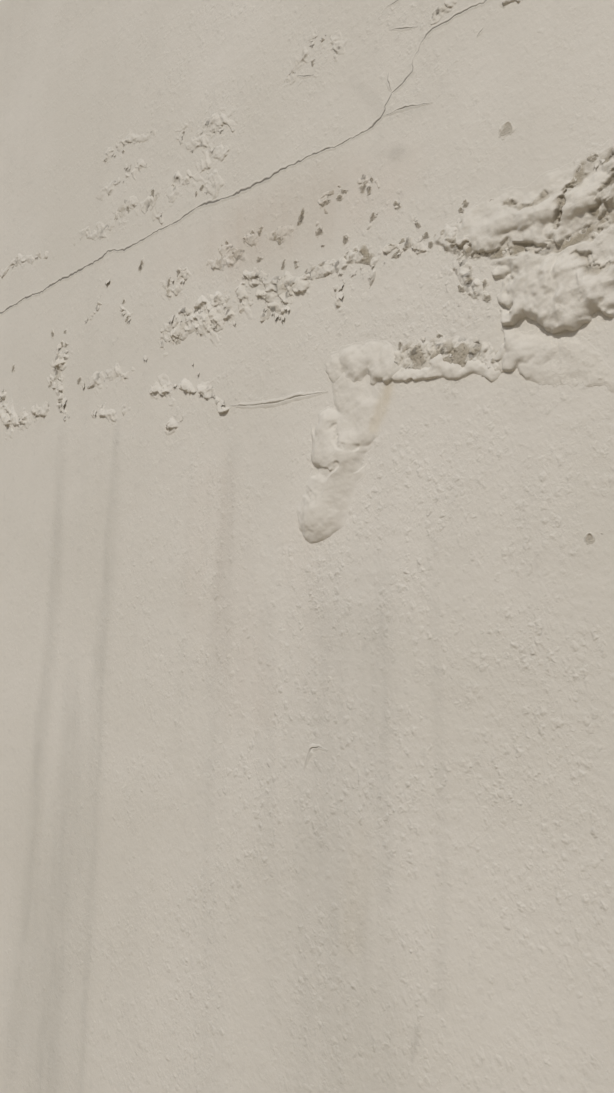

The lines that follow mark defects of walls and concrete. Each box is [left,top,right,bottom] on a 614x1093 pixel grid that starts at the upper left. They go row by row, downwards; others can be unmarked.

peeling [73,104,237,246]
crack [0,0,491,315]
peeling [158,174,495,358]
peeling [0,329,73,440]
peeling [77,355,147,425]
peeling [149,364,230,436]
crack [230,391,327,409]
peeling [393,331,504,377]